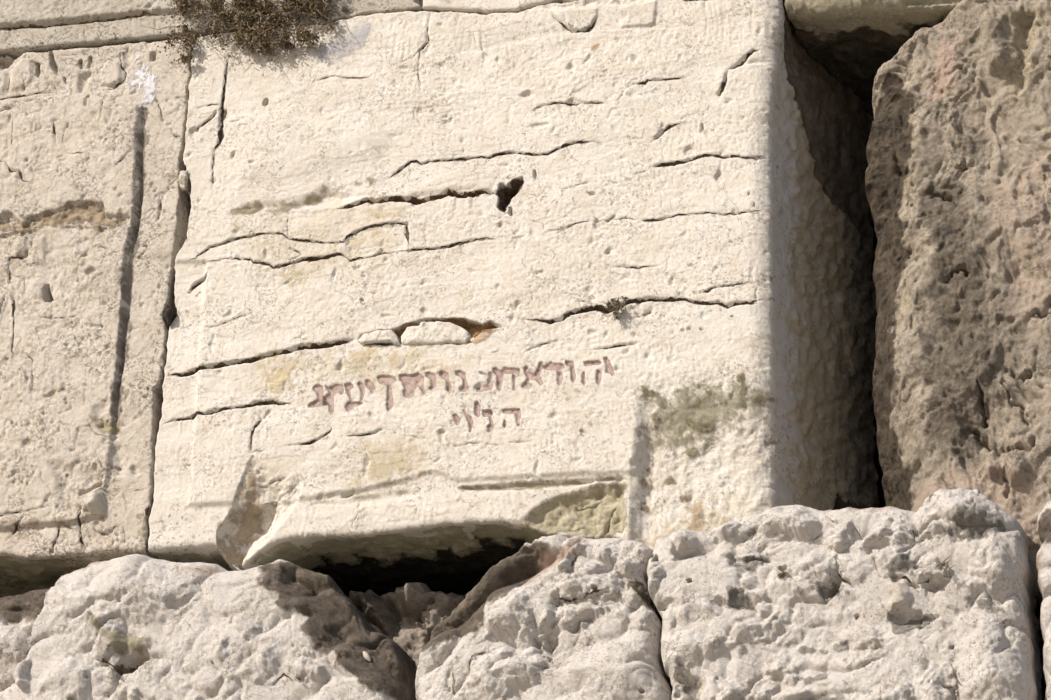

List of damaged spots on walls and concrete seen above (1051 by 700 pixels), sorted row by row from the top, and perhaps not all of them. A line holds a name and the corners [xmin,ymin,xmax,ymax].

crack [535,75,690,113]
crack [639,123,761,173]
crack [187,140,603,291]
crack [542,209,763,230]
crack [520,282,760,351]
crack [168,337,358,377]
leakage [641,385,659,400]
leakage [737,373,773,407]
leakage [665,418,715,457]